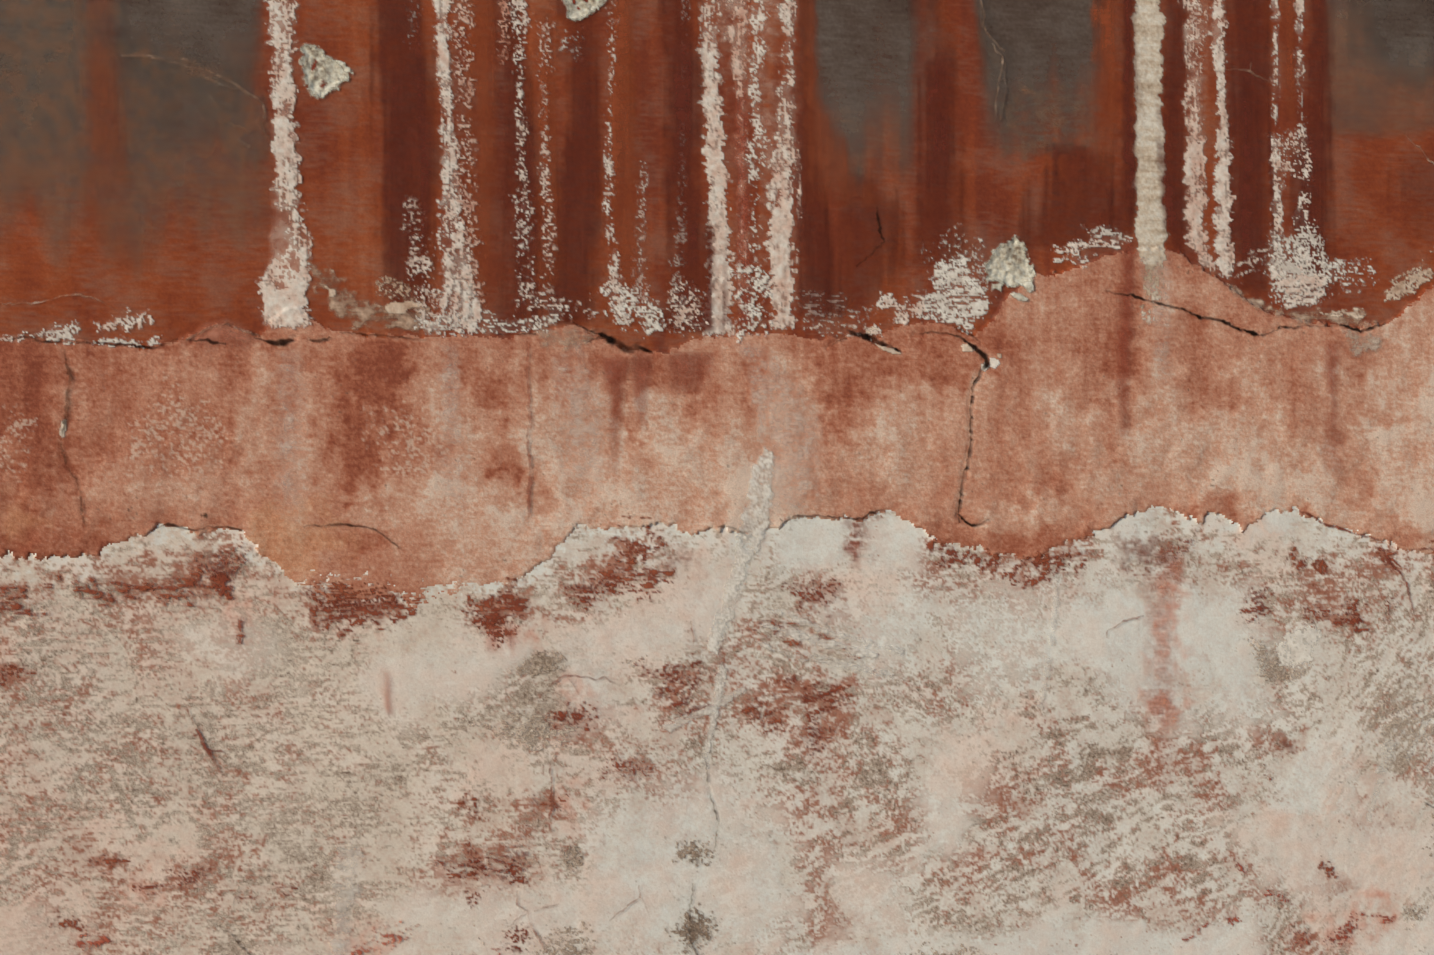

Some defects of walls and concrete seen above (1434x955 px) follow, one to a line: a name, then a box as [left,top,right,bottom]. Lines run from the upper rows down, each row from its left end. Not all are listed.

corrosion [1280,0,1294,29]
corrosion [540,36,556,251]
corrosion [610,0,636,311]
leakage [378,0,989,343]
leakage [977,0,1434,322]
crack [1126,294,1298,336]
crack [1340,324,1380,333]
crack [850,331,989,527]
peeling [0,542,251,618]
peeling [306,582,420,636]
peeling [564,516,675,611]
peeling [926,539,1087,589]